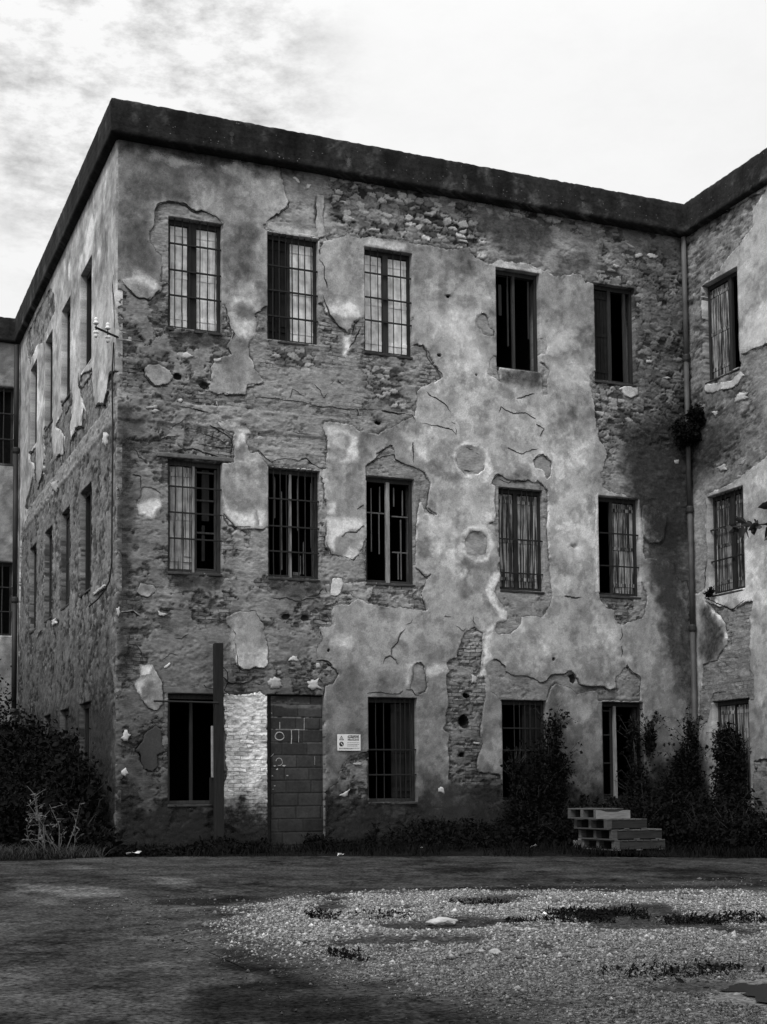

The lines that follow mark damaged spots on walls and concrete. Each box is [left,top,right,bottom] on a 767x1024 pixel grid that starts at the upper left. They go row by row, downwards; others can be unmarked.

crack [227,348,548,491]
peeling [263,168,767,635]
peeling [18,203,441,845]
crack [384,619,413,664]
peeling [438,627,641,794]
crack [492,628,641,690]
peeling [698,602,754,727]